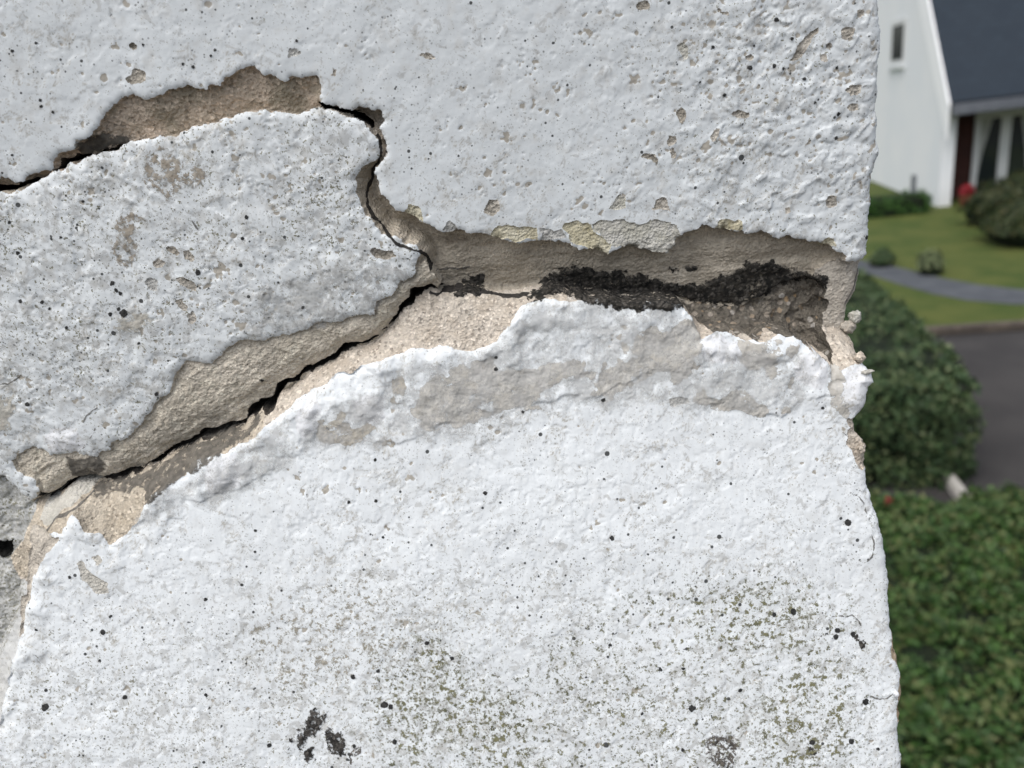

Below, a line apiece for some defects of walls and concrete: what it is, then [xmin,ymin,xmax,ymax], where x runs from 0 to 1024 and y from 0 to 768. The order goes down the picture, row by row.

crack [0,140,131,191]
water stain [453,273,485,297]
water stain [526,259,829,313]
crack [37,102,549,531]
spalling [0,65,874,637]